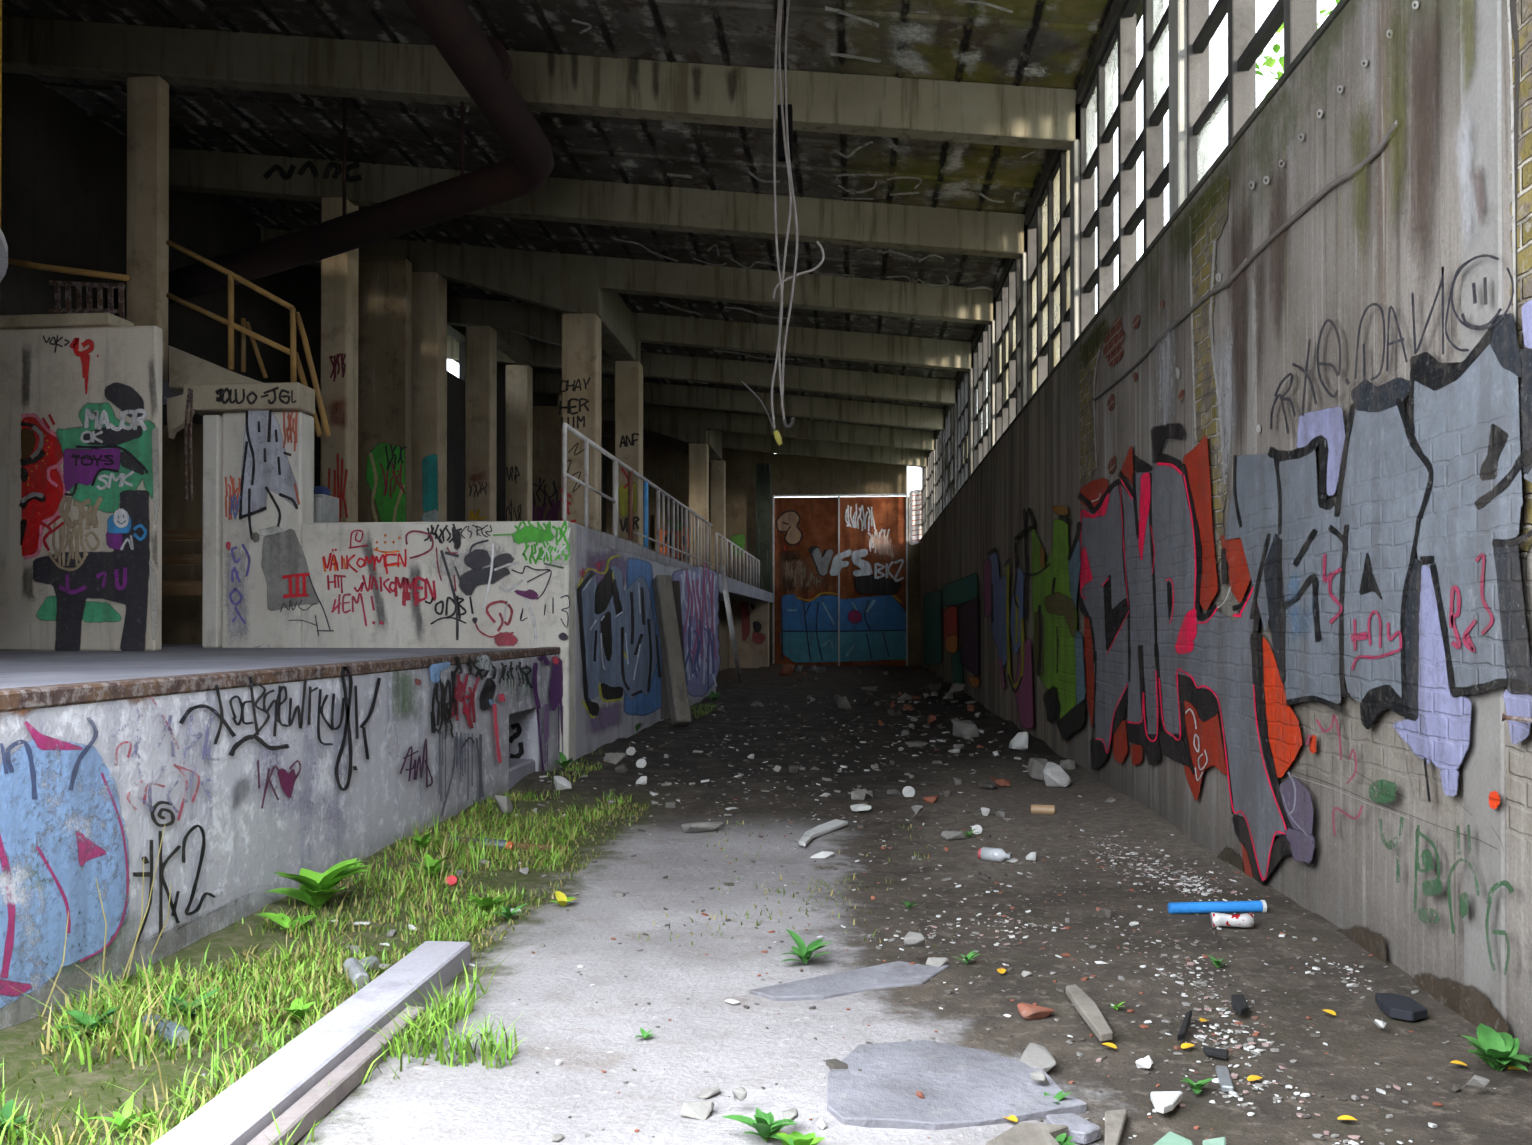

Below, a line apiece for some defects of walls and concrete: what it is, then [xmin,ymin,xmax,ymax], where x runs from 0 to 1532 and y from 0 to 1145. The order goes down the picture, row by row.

damp [1390,15,1438,258]
damp [1461,0,1473,79]
damp [1459,127,1484,231]
spalling [1507,0,1532,351]
damp [1159,332,1173,425]
spalling [1175,175,1230,566]
damp [1217,180,1284,473]
spalling [1516,376,1532,559]